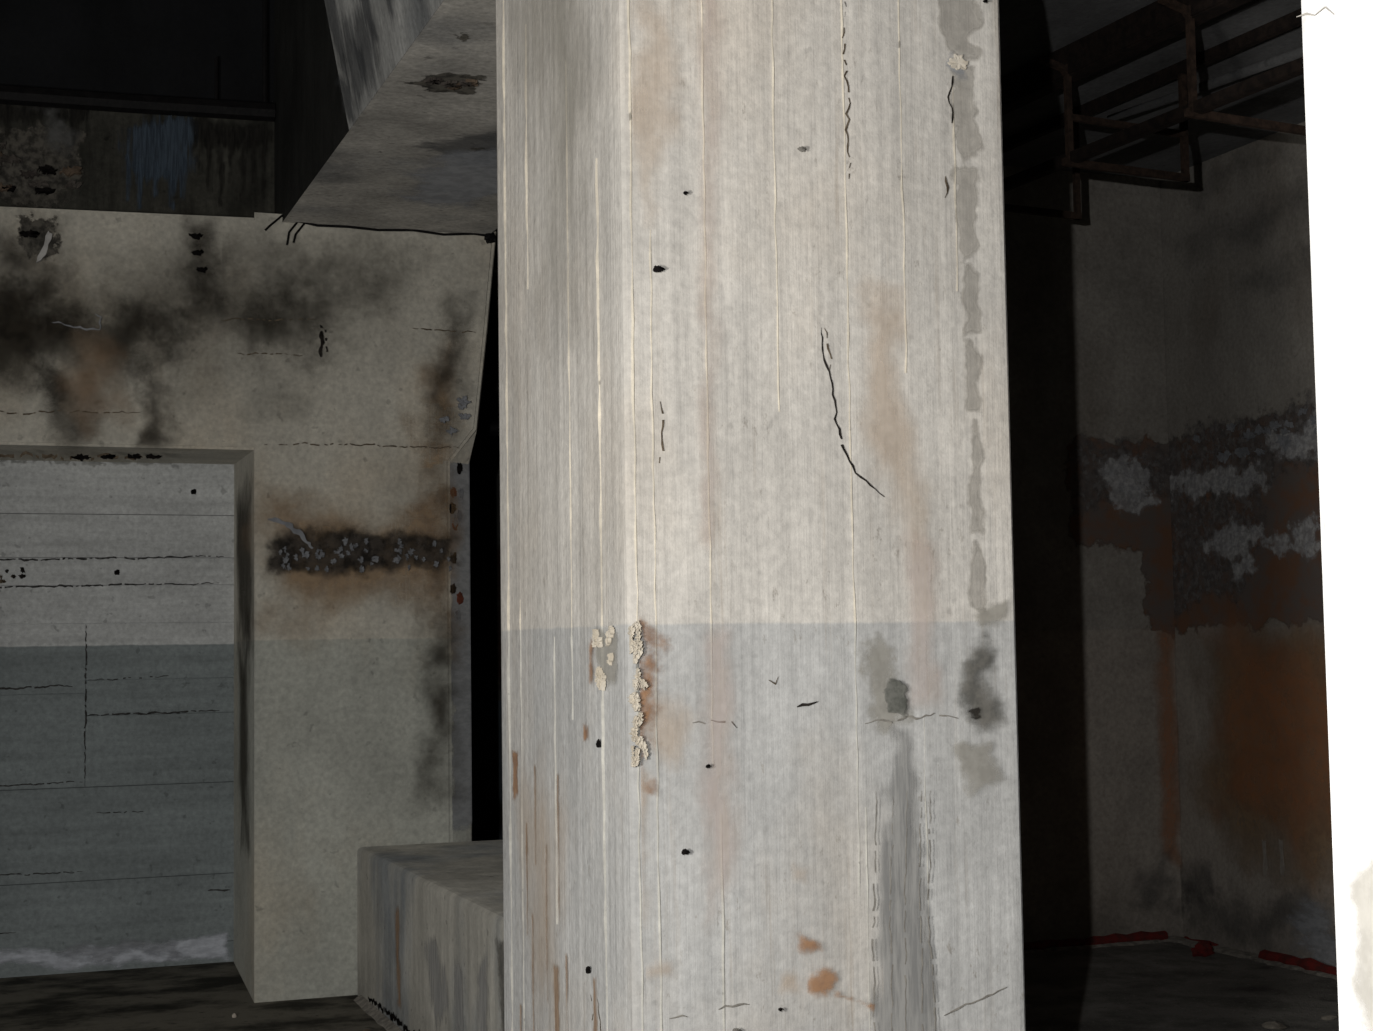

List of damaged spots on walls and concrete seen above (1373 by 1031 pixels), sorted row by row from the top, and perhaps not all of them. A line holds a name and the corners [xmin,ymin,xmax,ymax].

crack [821,328,885,497]
peeling [1064,394,1324,639]
peeling [279,463,502,828]
peeling [591,626,616,691]
damp [961,648,1000,728]
damp [956,744,997,787]
damp [871,731,936,1031]
rust [554,956,567,1031]
rust [799,937,817,950]
rust [808,970,835,993]